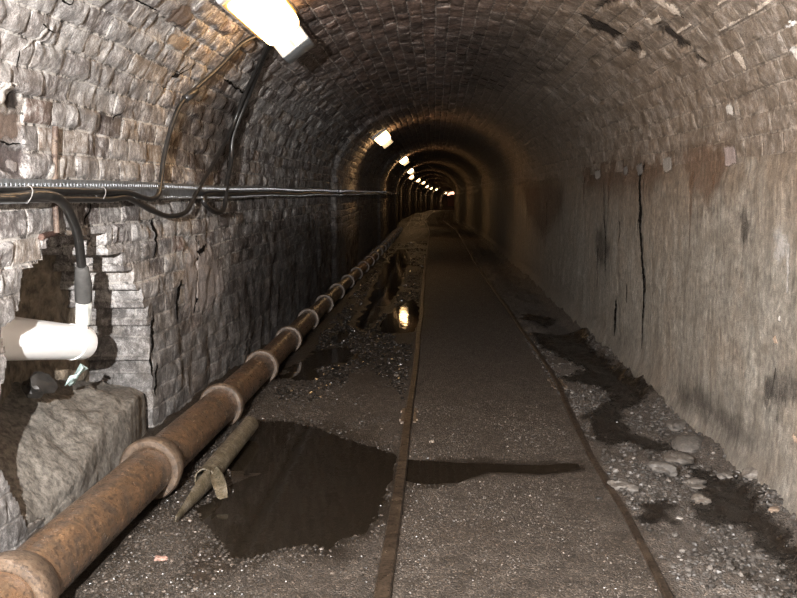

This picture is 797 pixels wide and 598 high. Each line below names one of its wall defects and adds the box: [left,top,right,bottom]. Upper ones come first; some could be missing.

spalling [581,14,622,38]
spalling [645,0,692,47]
spalling [629,42,646,59]
crack [604,161,646,349]